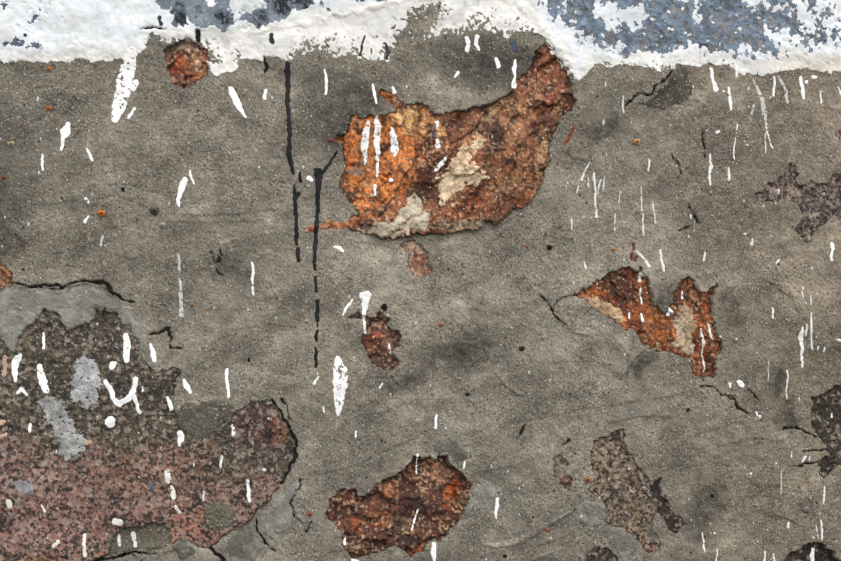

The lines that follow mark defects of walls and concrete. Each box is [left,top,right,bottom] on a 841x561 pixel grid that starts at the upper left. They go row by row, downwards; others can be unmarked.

peeling [2,36,43,51]
peeling [542,0,841,65]
flaking render [755,163,841,243]
crack [8,280,134,303]
flaking render [0,308,296,561]
flaking render [810,385,841,479]
flaking render [587,429,683,553]
flaking render [585,547,618,561]
flaking render [783,542,841,561]